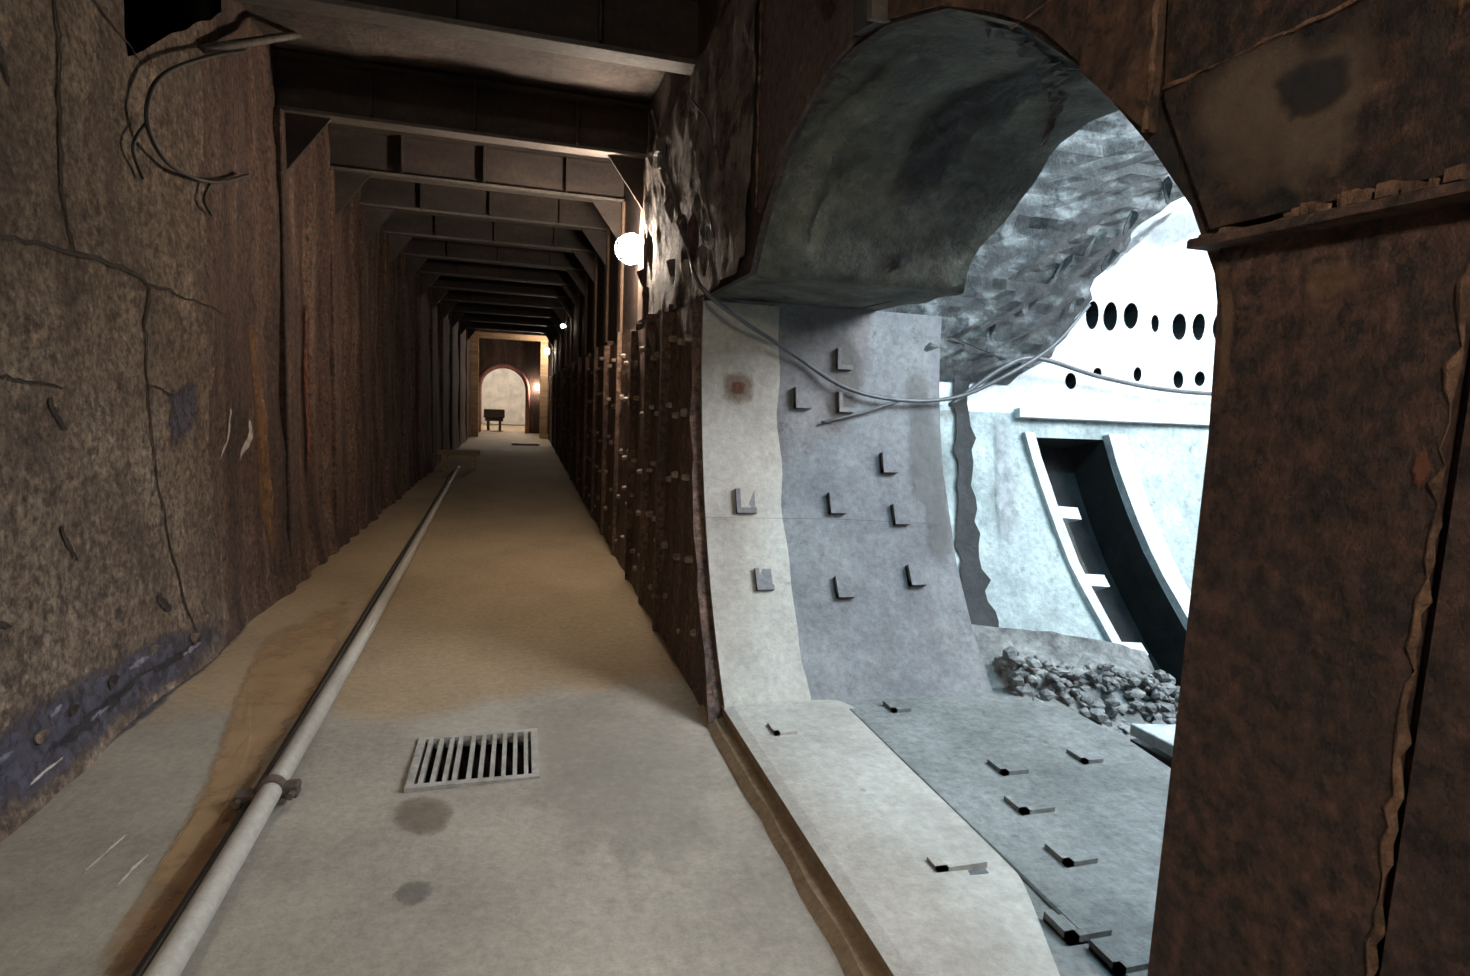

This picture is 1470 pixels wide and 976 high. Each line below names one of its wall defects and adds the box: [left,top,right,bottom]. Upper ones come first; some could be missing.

crack [0,0,228,640]
water stain [0,627,240,806]